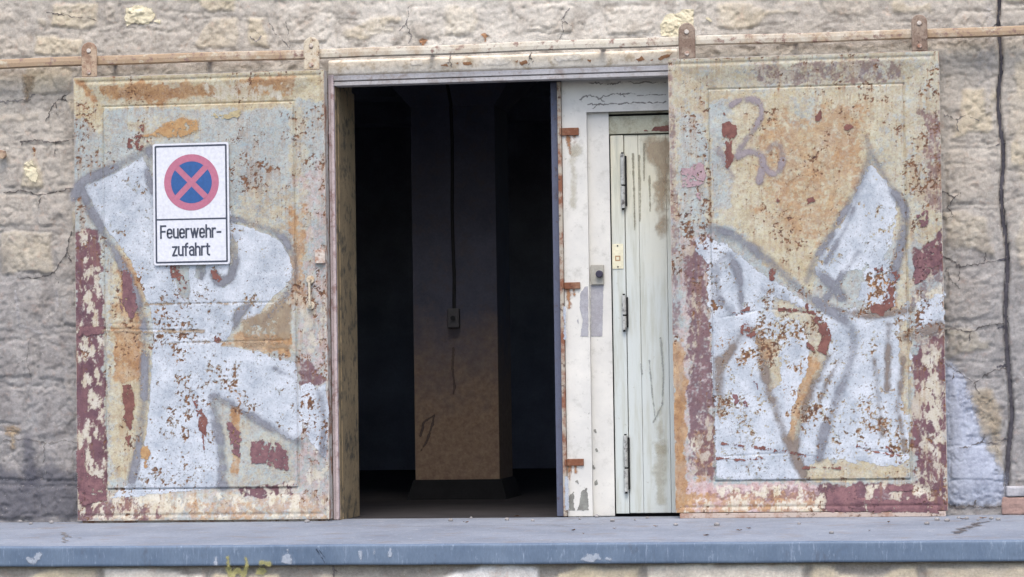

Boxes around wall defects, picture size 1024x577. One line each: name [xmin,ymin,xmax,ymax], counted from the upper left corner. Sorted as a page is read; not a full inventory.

crack [579,81,666,109]
damp [632,143,651,227]
crack [23,231,72,283]
peeling [119,270,138,320]
corrosion [104,265,291,348]
corrosion [557,82,577,516]
corrosion [778,303,832,355]
crack [943,0,1014,533]
peeling [122,384,135,445]
corrosion [193,400,209,450]
peeling [76,446,107,506]
peeling [824,484,939,514]